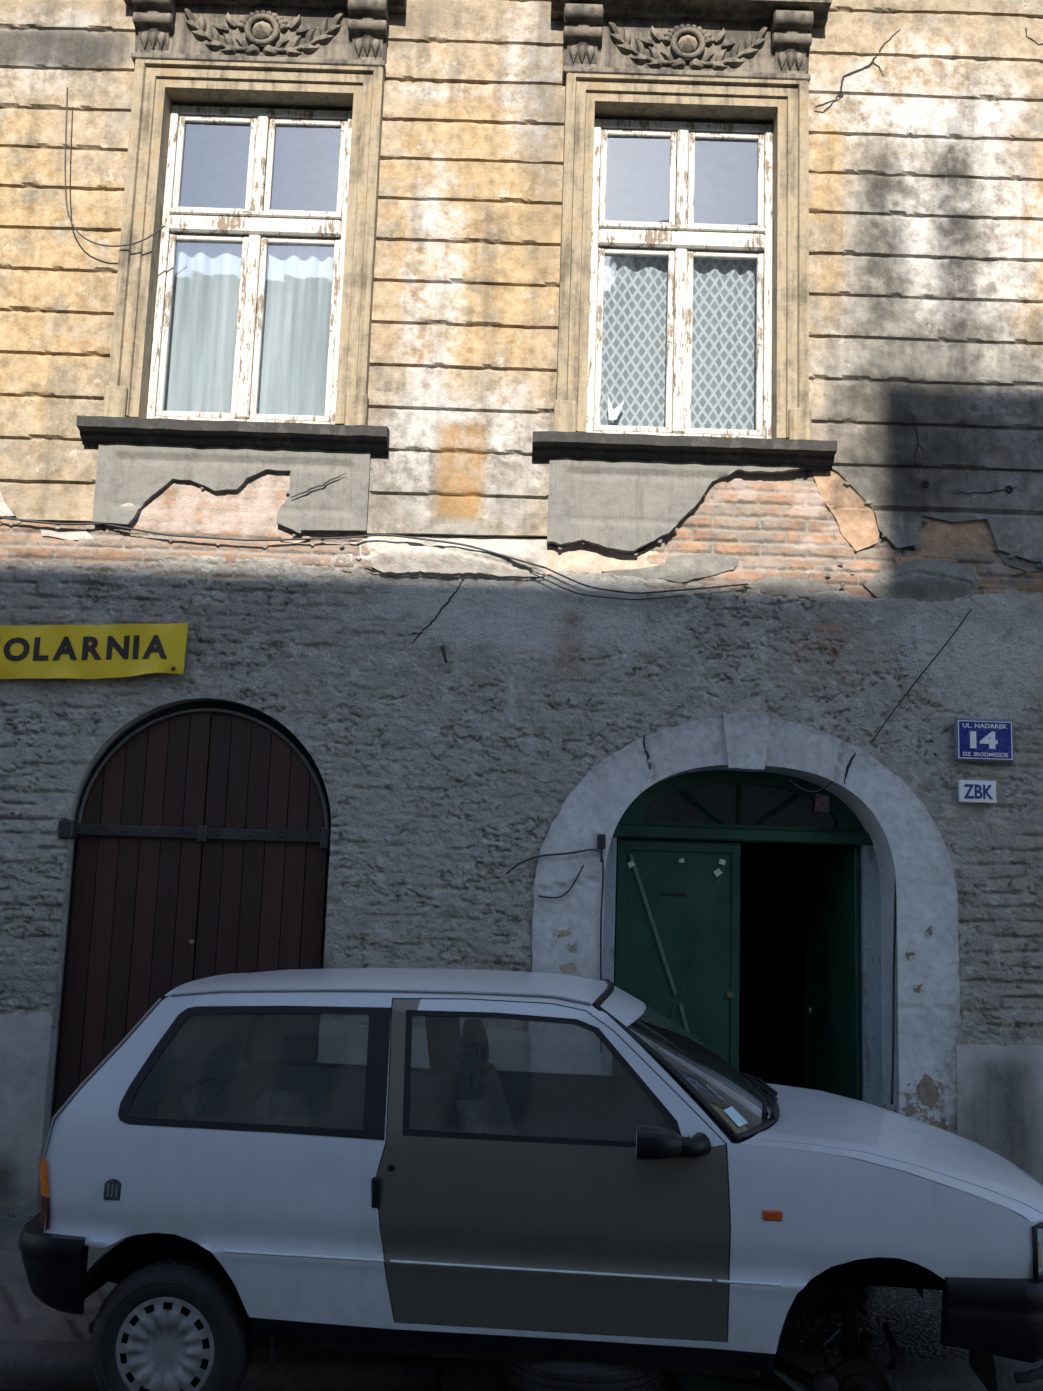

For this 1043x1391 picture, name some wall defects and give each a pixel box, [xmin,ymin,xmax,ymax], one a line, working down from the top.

crack [815,29,901,113]
flaking render [0,471,373,573]
flaking render [540,470,1043,602]
peeling [901,1073,949,1131]